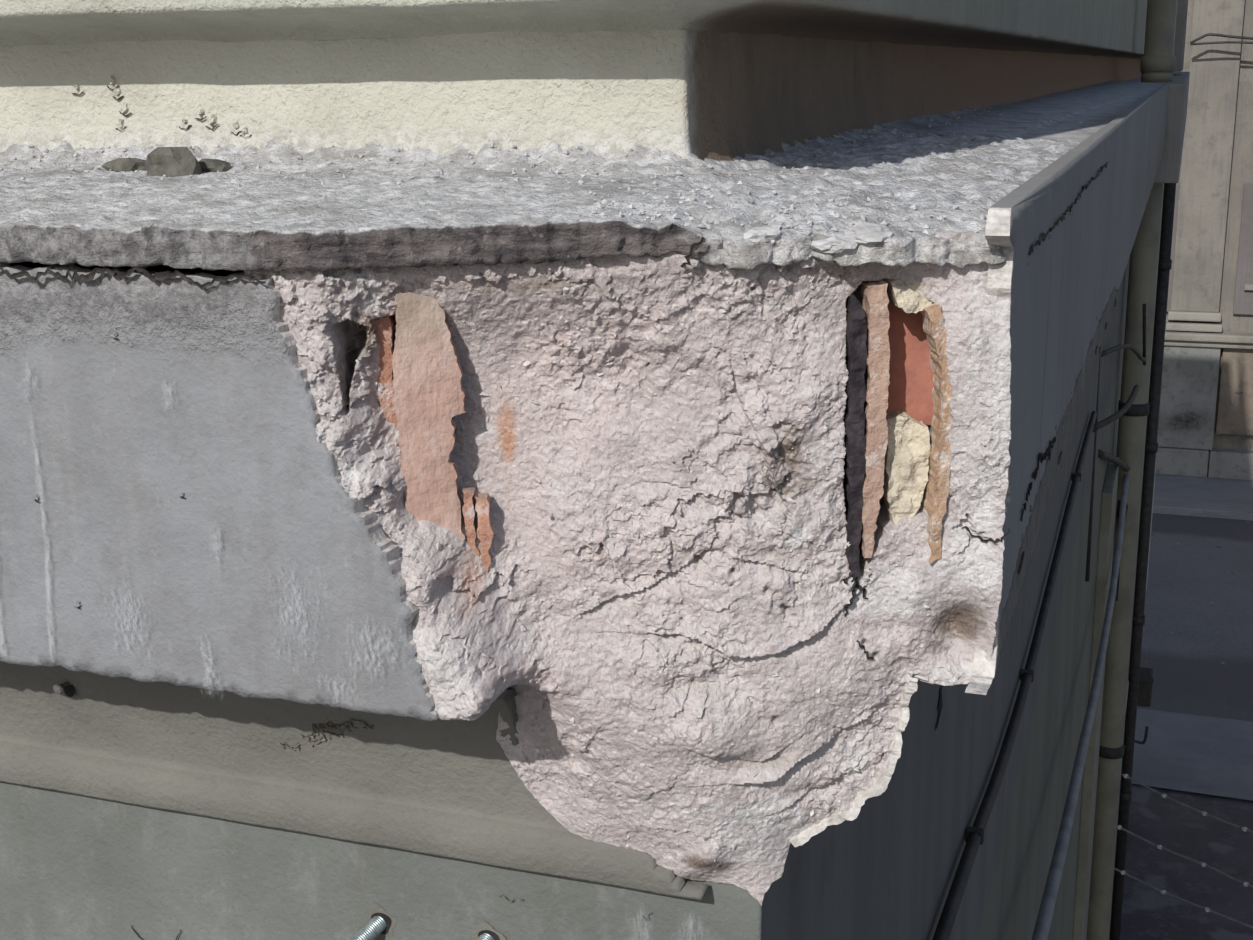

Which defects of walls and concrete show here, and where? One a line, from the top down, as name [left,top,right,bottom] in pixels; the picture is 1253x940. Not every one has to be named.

spalling [244,251,1119,906]